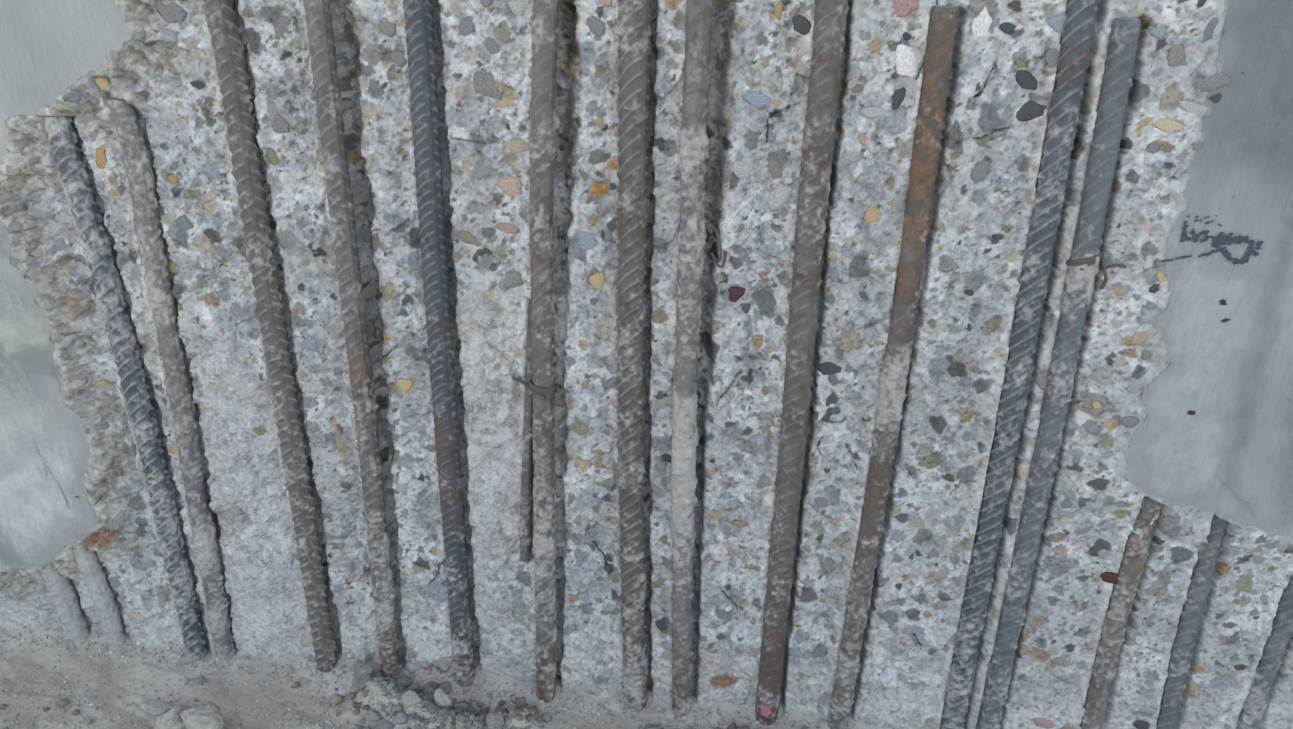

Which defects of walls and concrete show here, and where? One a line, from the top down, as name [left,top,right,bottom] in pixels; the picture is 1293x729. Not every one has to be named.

spalling [0,0,652,713]
spalling [643,0,1293,729]